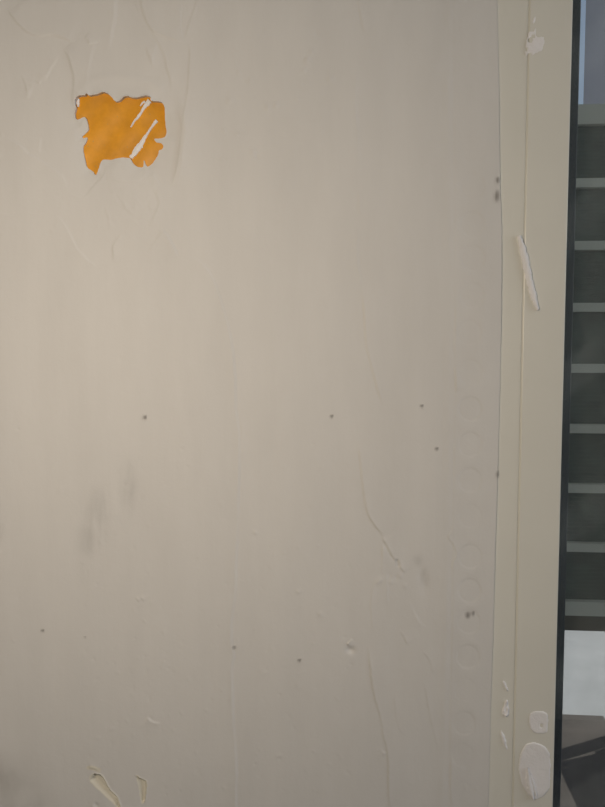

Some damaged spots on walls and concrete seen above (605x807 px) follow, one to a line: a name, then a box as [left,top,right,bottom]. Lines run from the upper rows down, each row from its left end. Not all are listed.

peeling [69,69,189,197]